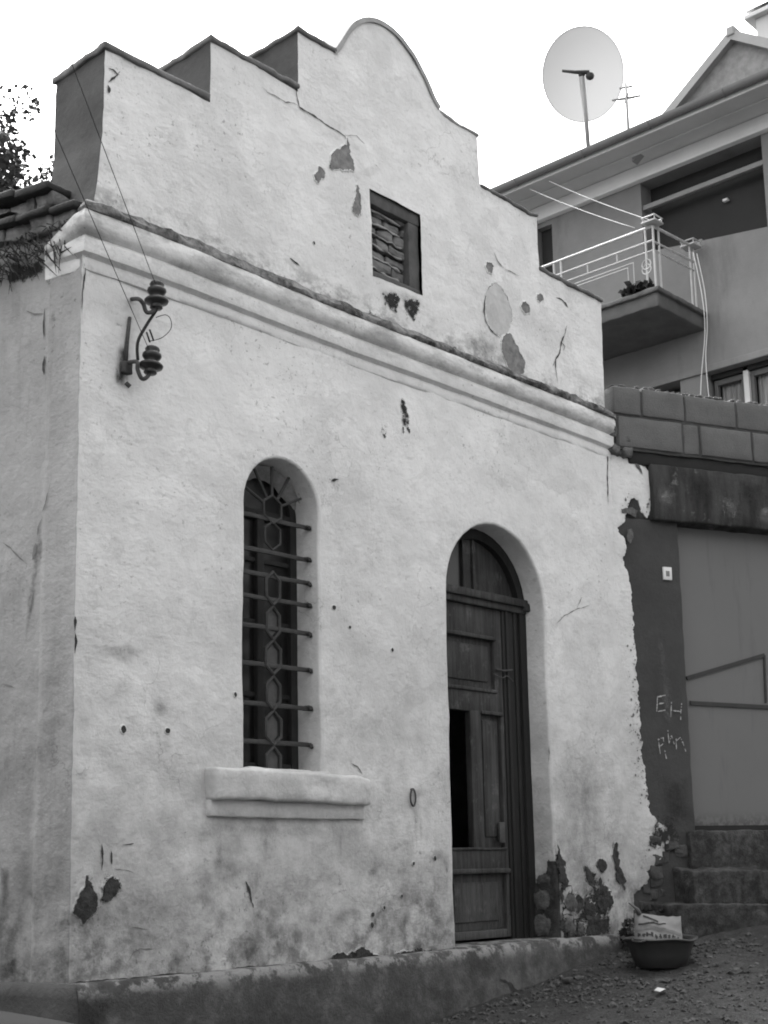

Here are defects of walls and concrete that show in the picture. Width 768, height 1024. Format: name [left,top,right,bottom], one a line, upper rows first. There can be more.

crack [268,89,359,138]
peeling [312,136,362,218]
peeling [484,261,544,375]
crack [553,297,568,381]
spalling [71,846,122,926]
spalling [534,841,626,938]
spalling [331,946,379,959]